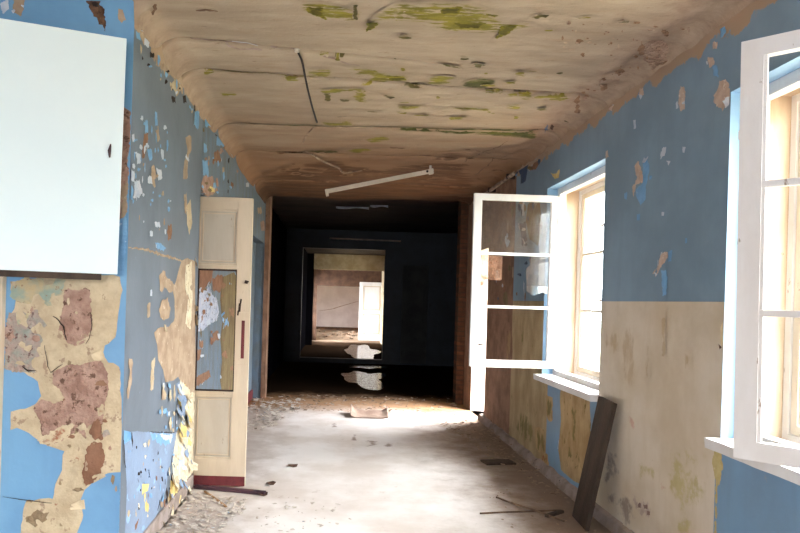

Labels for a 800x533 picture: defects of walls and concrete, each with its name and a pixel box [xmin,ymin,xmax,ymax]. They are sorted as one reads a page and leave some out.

flaking render [86,1,106,31]
peeling [136,30,234,197]
peeling [676,86,686,111]
peeling [184,192,192,234]
peeling [624,157,652,220]
peeling [653,250,672,296]
peeling [4,107,172,533]
water stain [603,317,667,390]
peeling [127,258,242,530]
water stain [599,446,639,530]
water stain [637,442,711,533]